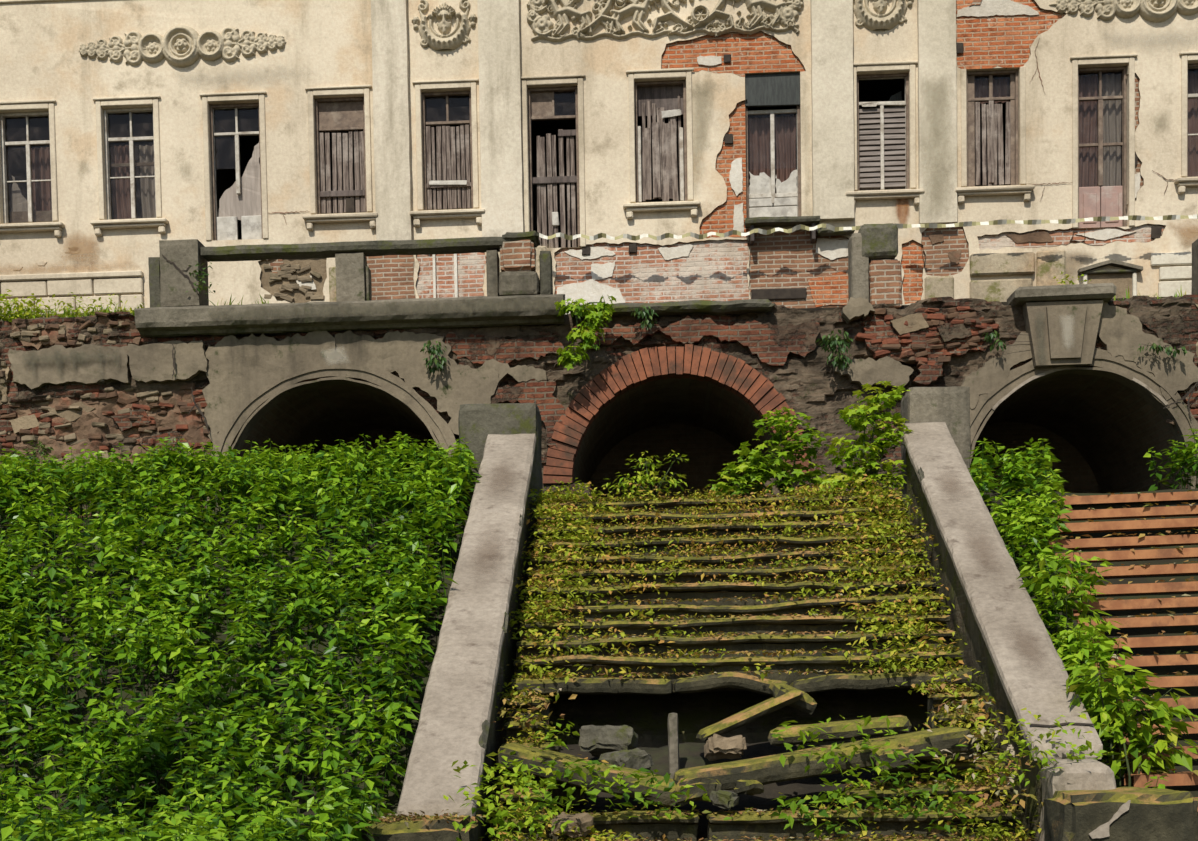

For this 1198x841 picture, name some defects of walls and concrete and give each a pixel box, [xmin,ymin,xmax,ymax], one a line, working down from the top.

flaking render [661,31,806,77]
flaking render [956,0,1067,69]
flaking render [554,99,849,367]
flaking render [258,258,327,303]
flaking render [854,224,1166,387]
flaking render [445,331,564,365]
flaking render [491,379,568,448]
flaking render [1183,385,1198,415]